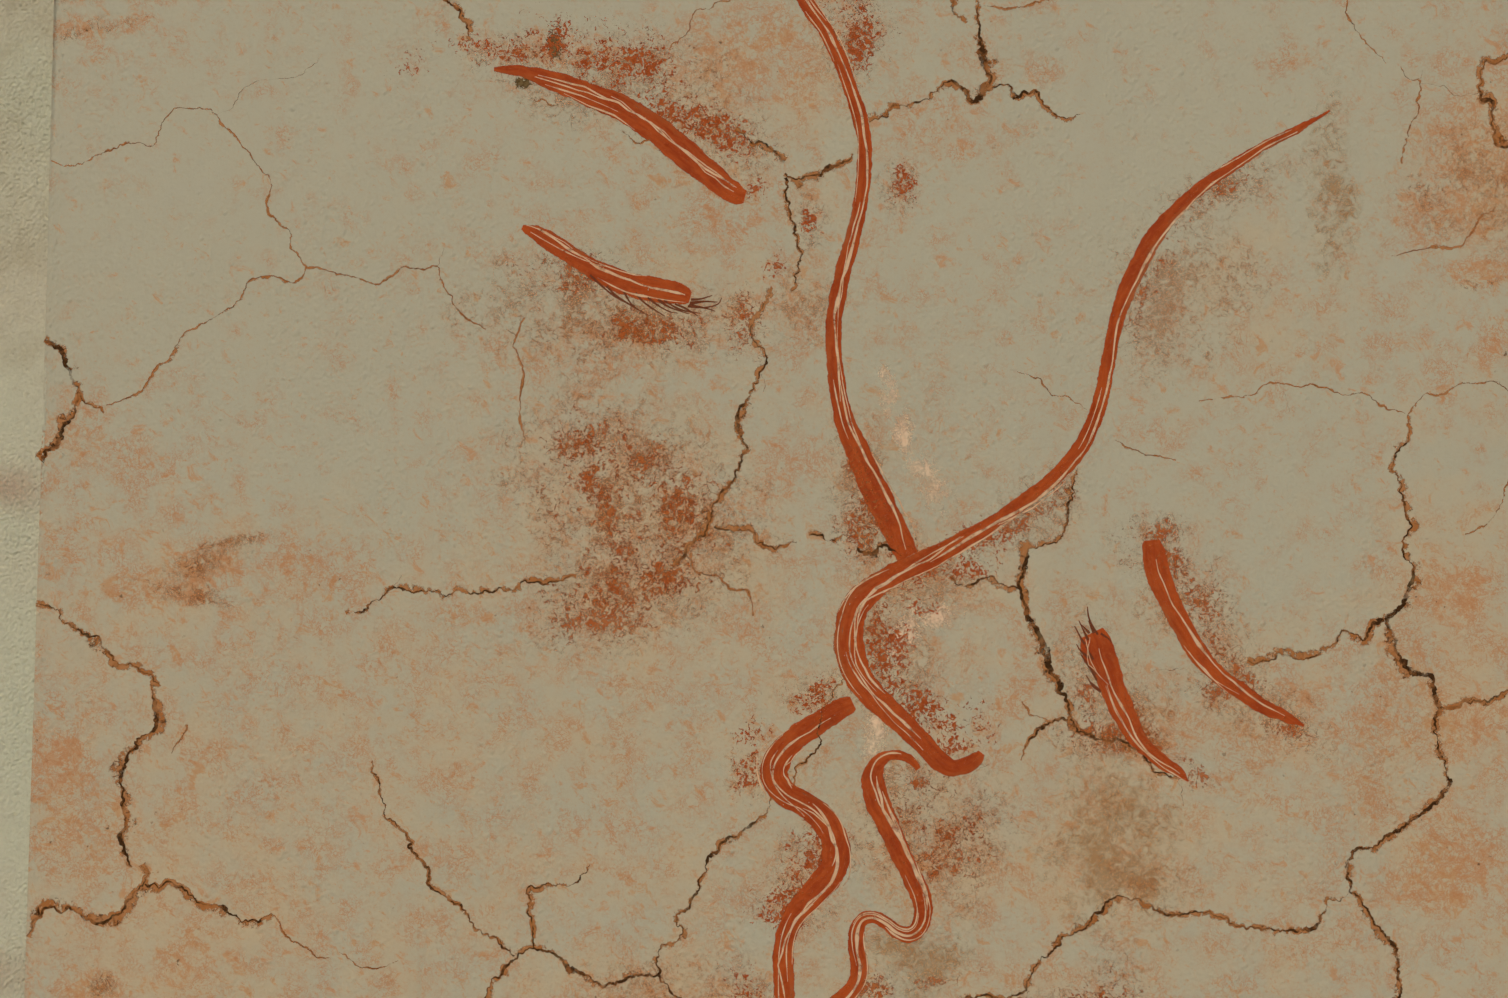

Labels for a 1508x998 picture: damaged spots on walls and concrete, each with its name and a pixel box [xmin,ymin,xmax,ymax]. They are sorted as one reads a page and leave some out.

crack [36,89,526,462]
crack [443,0,473,41]
crack [669,0,1081,616]
crack [1345,0,1508,164]
crack [1397,211,1494,256]
crack [27,600,397,970]
crack [345,574,577,615]
crack [370,678,845,998]
crack [950,381,1508,998]